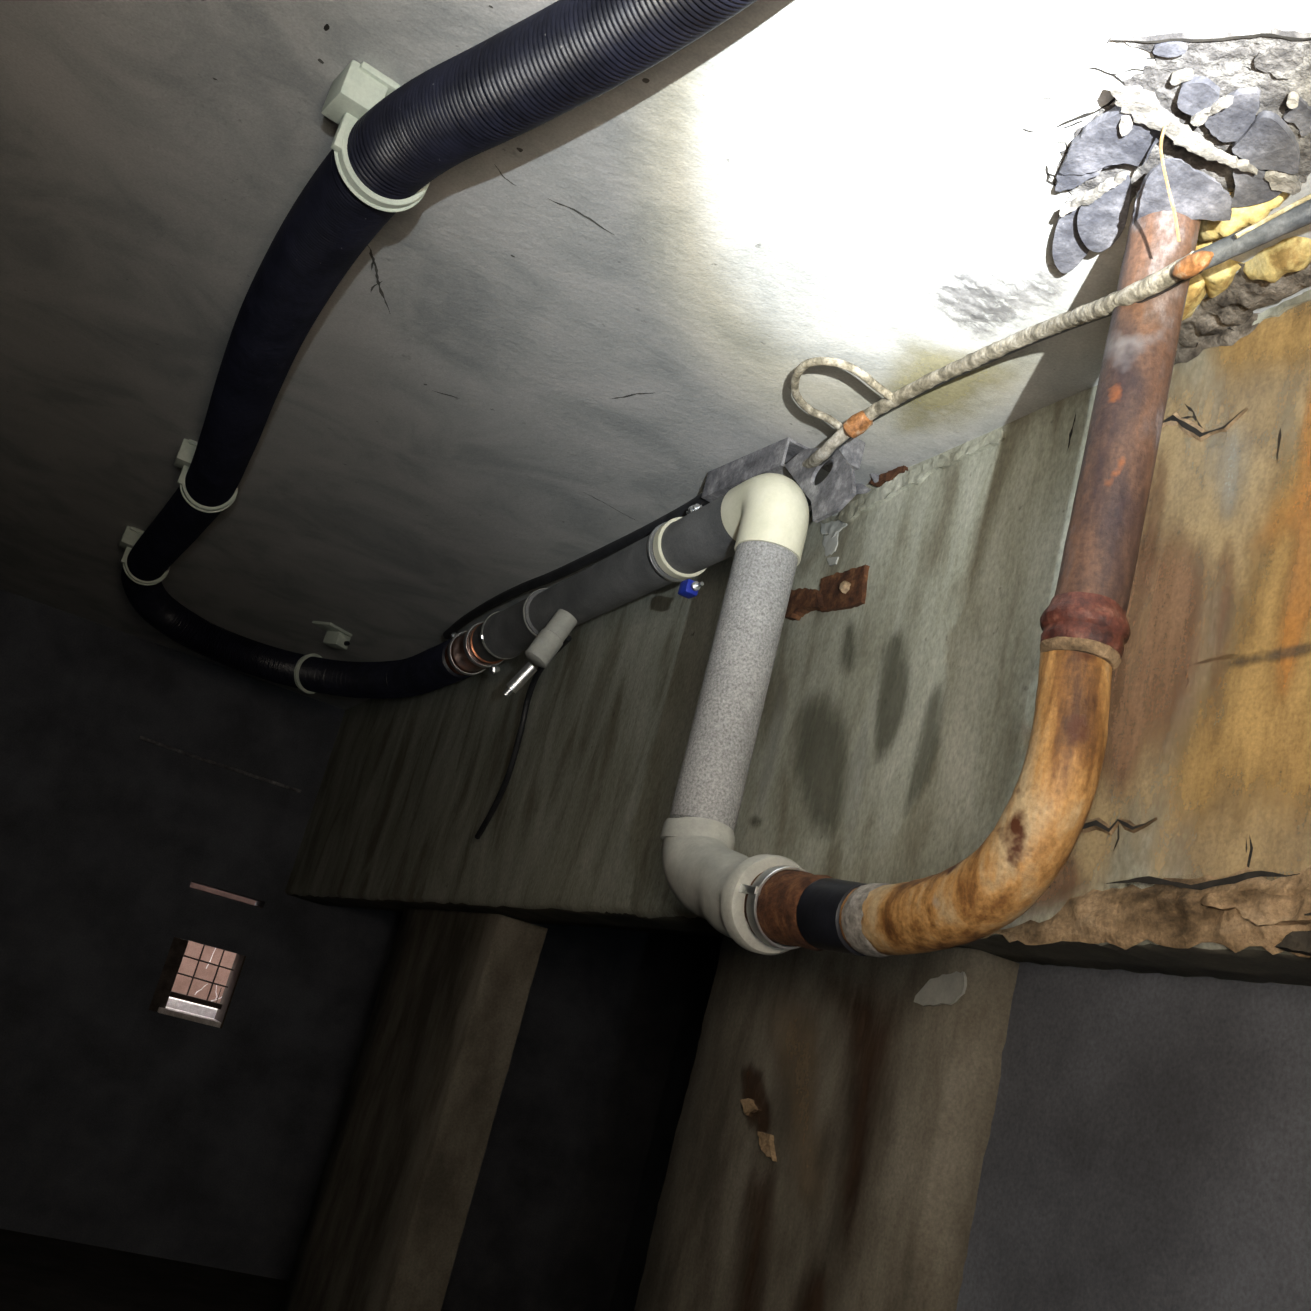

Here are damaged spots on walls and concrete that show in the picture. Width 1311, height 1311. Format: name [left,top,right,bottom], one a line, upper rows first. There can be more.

flaking render [934,36,1311,332]
spalling [1174,263,1311,365]
rust [1218,302,1311,367]
crack [1162,404,1248,442]
crack [1274,428,1282,462]
rust [1179,401,1311,808]
crack [1081,817,1157,851]
spalling [980,865,1311,958]